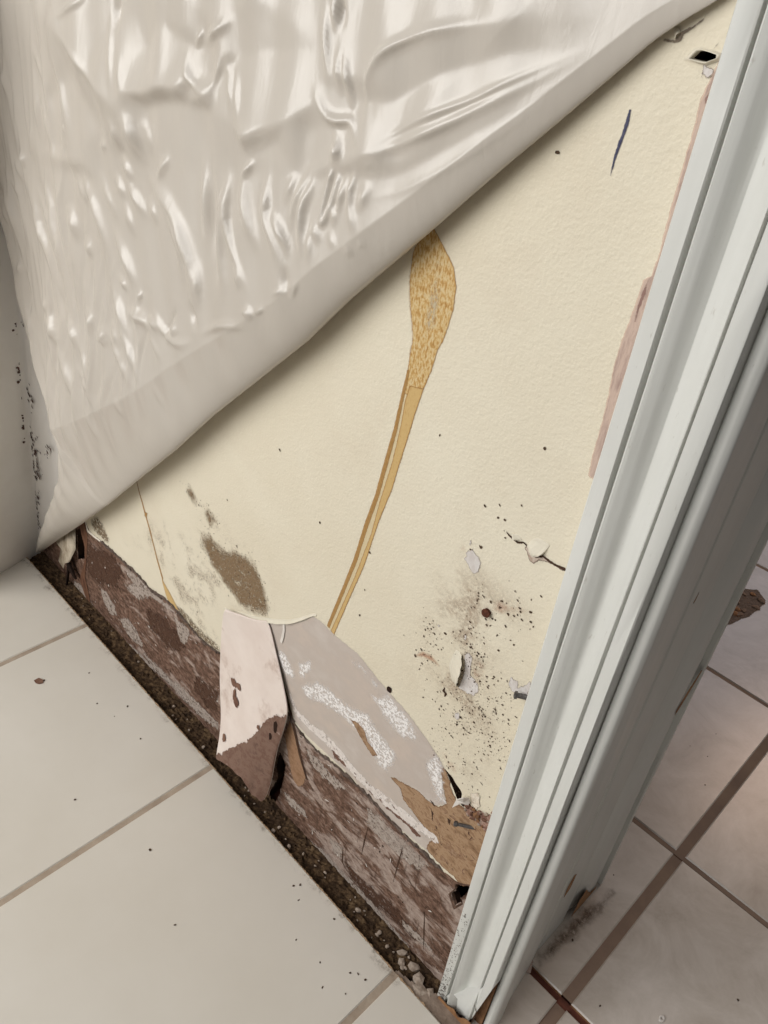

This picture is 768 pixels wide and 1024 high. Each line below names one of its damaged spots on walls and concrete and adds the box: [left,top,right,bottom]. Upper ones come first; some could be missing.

peeling [588,48,721,479]
mould [16,367,52,529]
peeling [44,522,221,741]
mould [186,483,268,616]
mould [414,579,542,794]
crack [506,532,566,571]
peeling [527,538,550,557]
peeling [223,607,492,982]